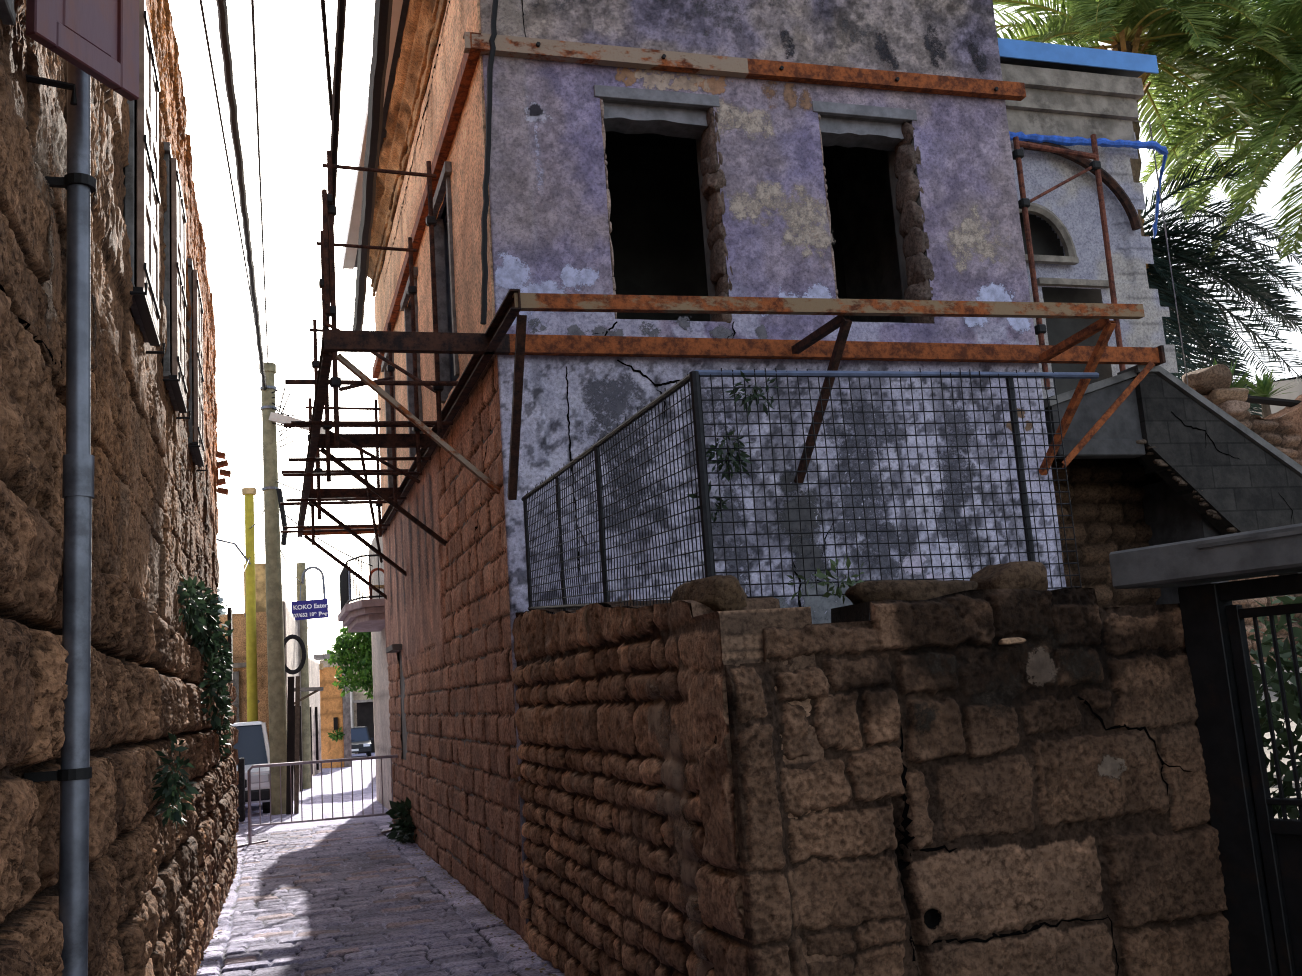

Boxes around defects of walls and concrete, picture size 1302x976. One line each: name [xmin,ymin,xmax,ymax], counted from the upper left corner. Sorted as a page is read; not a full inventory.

corrosion [615,67,733,95]
peeling [495,96,616,295]
spalling [700,99,839,299]
crack [0,284,62,368]
peeling [512,311,551,334]
peeling [567,312,624,336]
peeling [676,314,736,339]
crack [592,321,679,417]
crack [1171,411,1239,459]
crack [1077,696,1191,815]